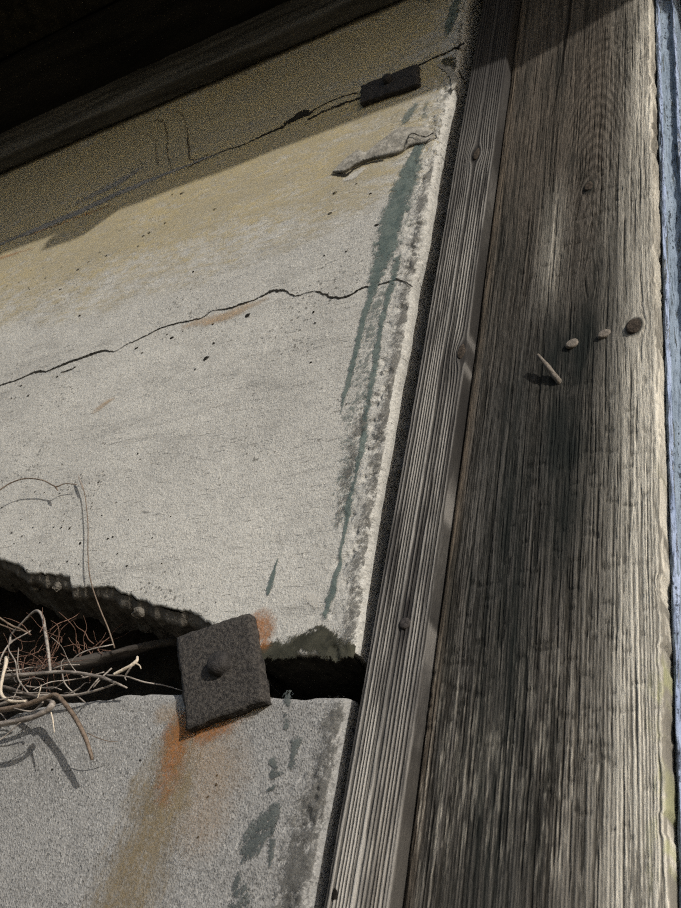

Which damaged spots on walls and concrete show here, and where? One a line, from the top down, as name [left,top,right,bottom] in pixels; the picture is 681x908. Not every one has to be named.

crack [418,42,465,66]
crack [151,92,360,169]
spalling [331,126,437,184]
crack [0,278,413,386]
water stain [0,0,462,646]
spalling [0,560,211,646]
water stain [272,696,344,908]